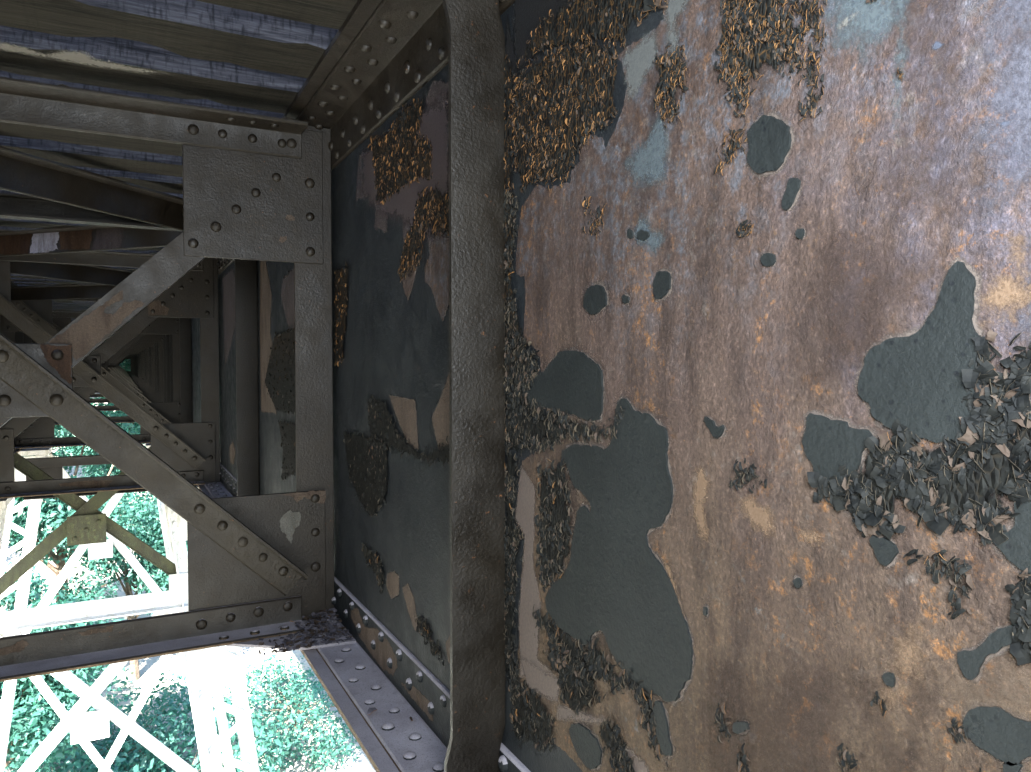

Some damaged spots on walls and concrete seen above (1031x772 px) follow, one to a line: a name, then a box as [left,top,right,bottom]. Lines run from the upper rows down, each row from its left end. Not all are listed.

peeling [356,78,449,321]
corrosion [361,92,449,241]
corrosion [983,277,1028,318]
peeling [260,261,296,480]
peeling [389,395,419,450]
peeling [432,373,449,450]
peeling [503,0,1031,772]
peeling [280,490,326,543]
corrosion [693,468,710,541]
corrosion [741,497,776,536]
peeling [386,571,450,666]
corrosion [880,625,923,707]